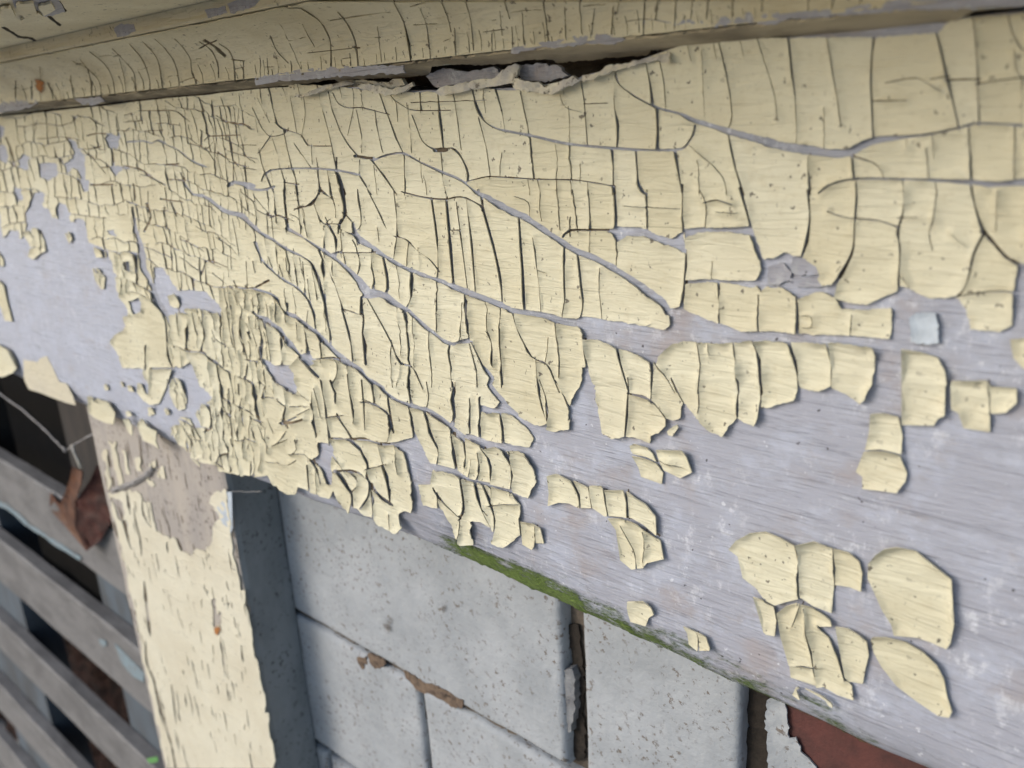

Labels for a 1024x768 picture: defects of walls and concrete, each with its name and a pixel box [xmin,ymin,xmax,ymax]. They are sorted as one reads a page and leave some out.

crack [1,3,67,42]
crack [393,0,734,61]
peeling [0,0,1024,570]
crack [0,17,1024,624]
crack [129,581,199,768]
peeling [99,441,276,768]
spalling [357,653,387,669]
spalling [403,670,464,709]
peeling [627,601,654,626]
peeling [683,627,710,651]
peeling [729,531,954,768]